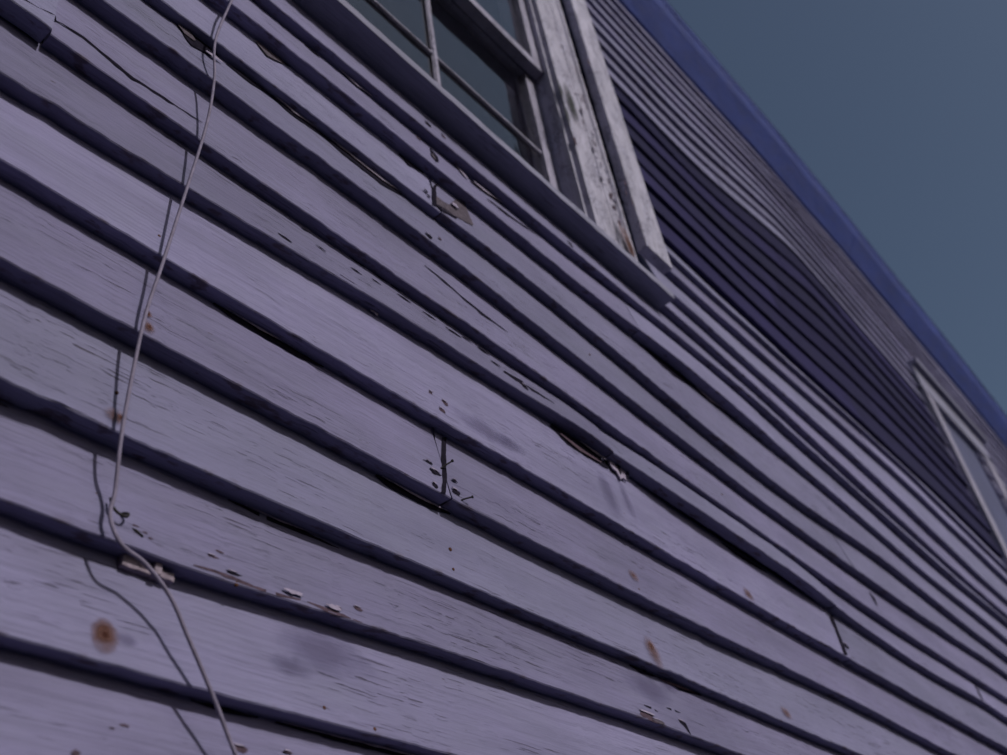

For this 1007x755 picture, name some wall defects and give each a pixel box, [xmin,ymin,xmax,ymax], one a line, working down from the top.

crack [26,0,201,122]
spalling [436,197,473,225]
crack [504,371,616,475]
crack [375,437,474,515]
peeling [194,550,363,623]
rust [94,622,116,646]